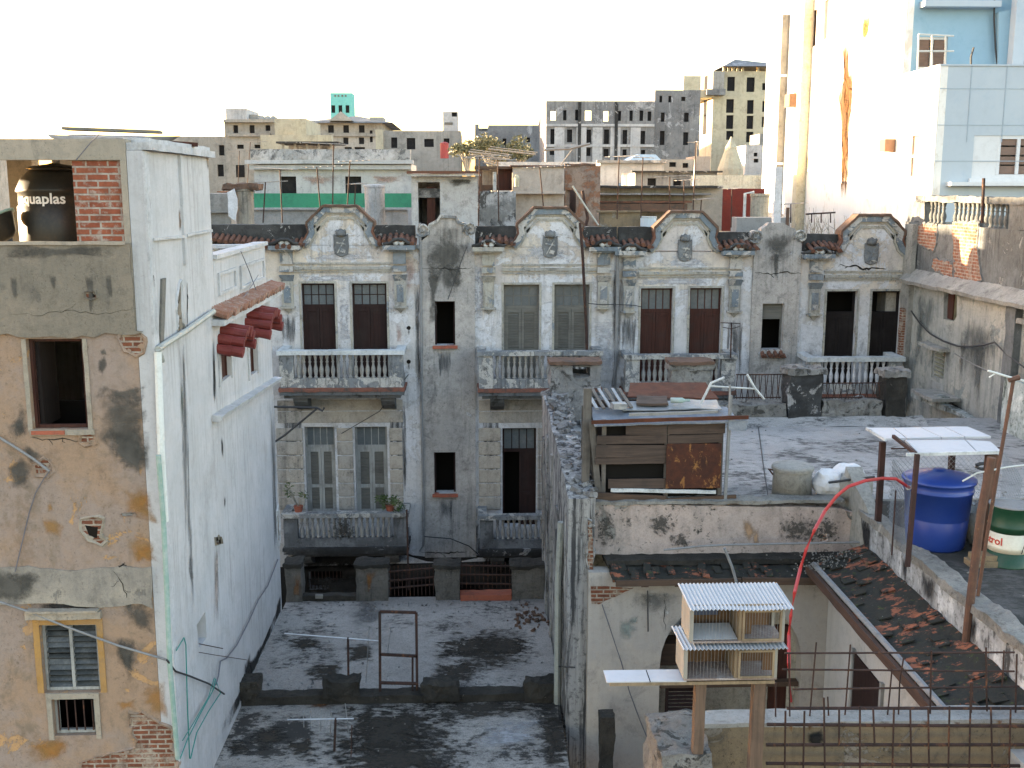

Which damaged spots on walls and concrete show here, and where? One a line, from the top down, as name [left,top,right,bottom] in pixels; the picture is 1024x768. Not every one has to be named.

rust [839,45,853,189]
crack [840,263,884,271]
flaking render [917,219,984,282]
leakage [415,230,460,373]
flaking render [115,333,148,359]
leakage [103,389,146,470]
leakage [10,448,37,484]
spalling [78,515,109,548]
leakage [598,514,615,545]
leakage [649,515,688,547]
flaking render [78,710,181,768]